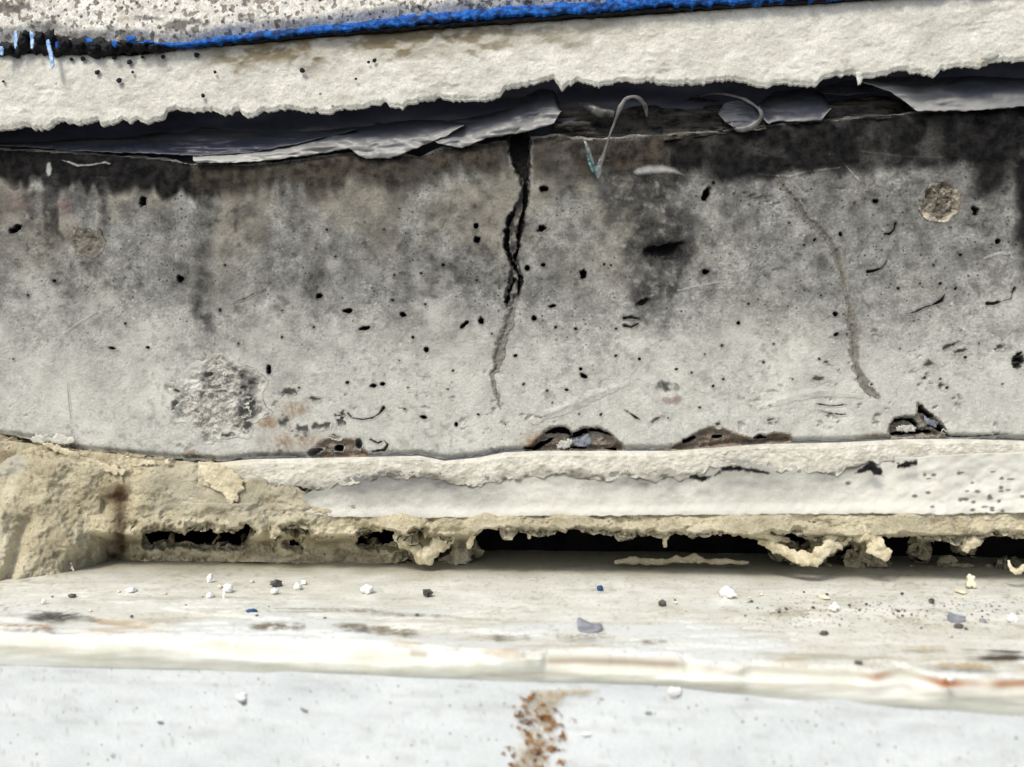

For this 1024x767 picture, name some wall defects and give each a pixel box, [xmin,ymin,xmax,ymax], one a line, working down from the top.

leakage [0,142,507,230]
leakage [533,108,1024,301]
crack [489,131,532,409]
peeling [28,433,171,481]
peeling [199,461,245,504]
spalling [163,348,370,458]
spalling [523,424,625,451]
spalling [666,415,793,451]
spalling [888,401,948,439]
rust [501,691,576,767]